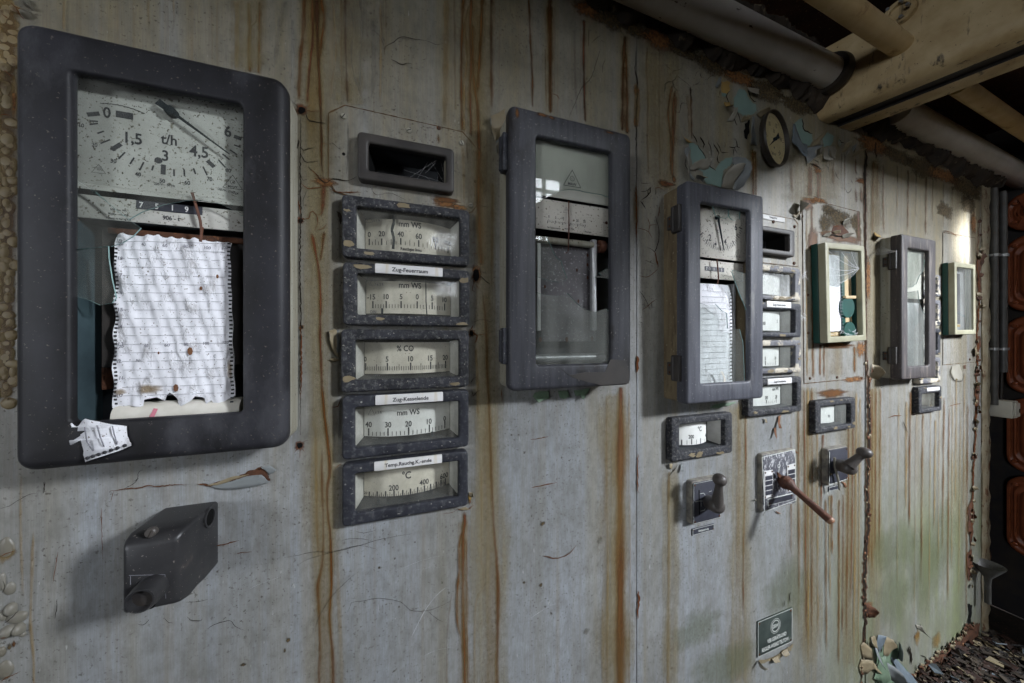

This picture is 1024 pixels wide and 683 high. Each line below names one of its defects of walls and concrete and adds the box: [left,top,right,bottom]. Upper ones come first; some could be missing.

corrosion [296,0,493,282]
corrosion [528,0,555,119]
peeling [683,136,753,190]
peeling [716,76,771,145]
peeling [823,217,854,238]
crack [101,471,182,559]
peeling [198,466,276,489]
corrosion [312,234,334,683]
corrosion [763,262,881,656]
corrosion [898,378,968,559]
corrosion [456,513,468,683]
peeling [859,604,980,683]